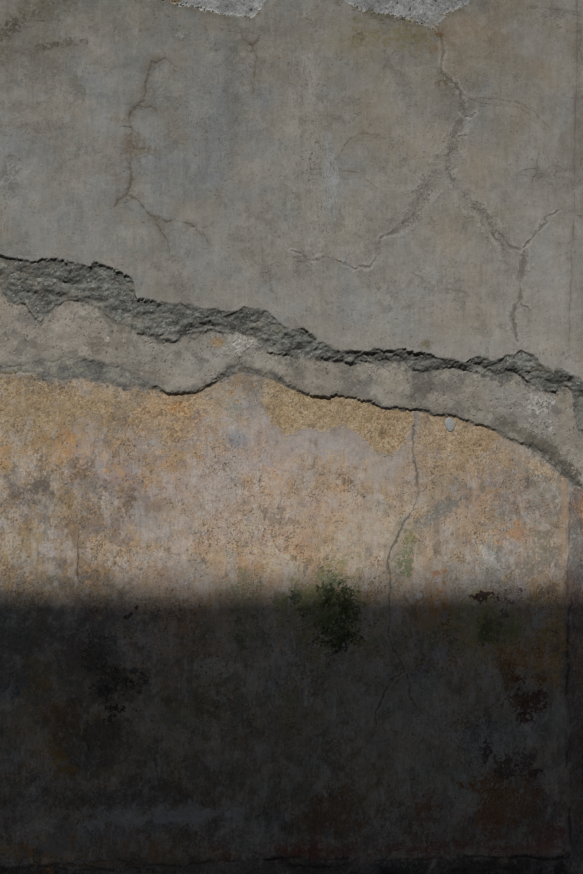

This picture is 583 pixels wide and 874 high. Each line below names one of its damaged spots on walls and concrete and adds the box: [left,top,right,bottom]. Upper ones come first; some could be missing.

spalling [163,0,267,18]
spalling [343,0,470,25]
crack [106,52,213,262]
crack [279,0,583,361]
spalling [0,255,583,431]
spalling [0,356,583,488]